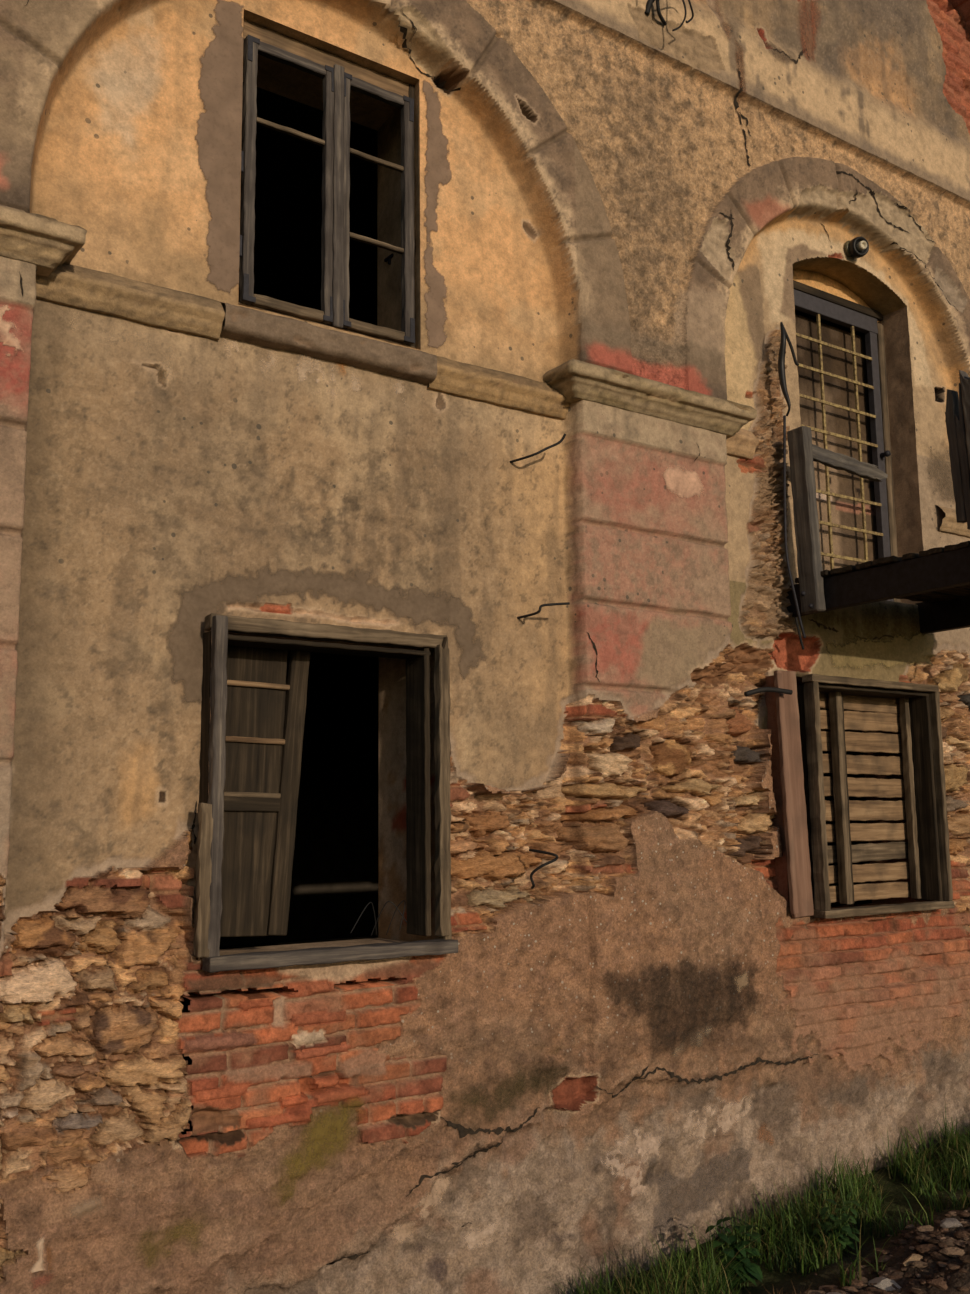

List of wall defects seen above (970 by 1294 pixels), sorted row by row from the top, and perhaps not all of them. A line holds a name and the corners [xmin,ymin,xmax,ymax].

crack [734,58,751,166]
flaking render [926,0,970,135]
crack [836,171,958,311]
peeling [0,305,20,355]
spalling [226,602,400,626]
spalling [450,330,970,1074]
water stain [736,974,748,991]
spalling [0,828,447,1281]
spalling [552,1074,599,1111]
crack [597,1054,818,1098]
crack [406,1107,540,1197]
crack [326,1251,370,1265]